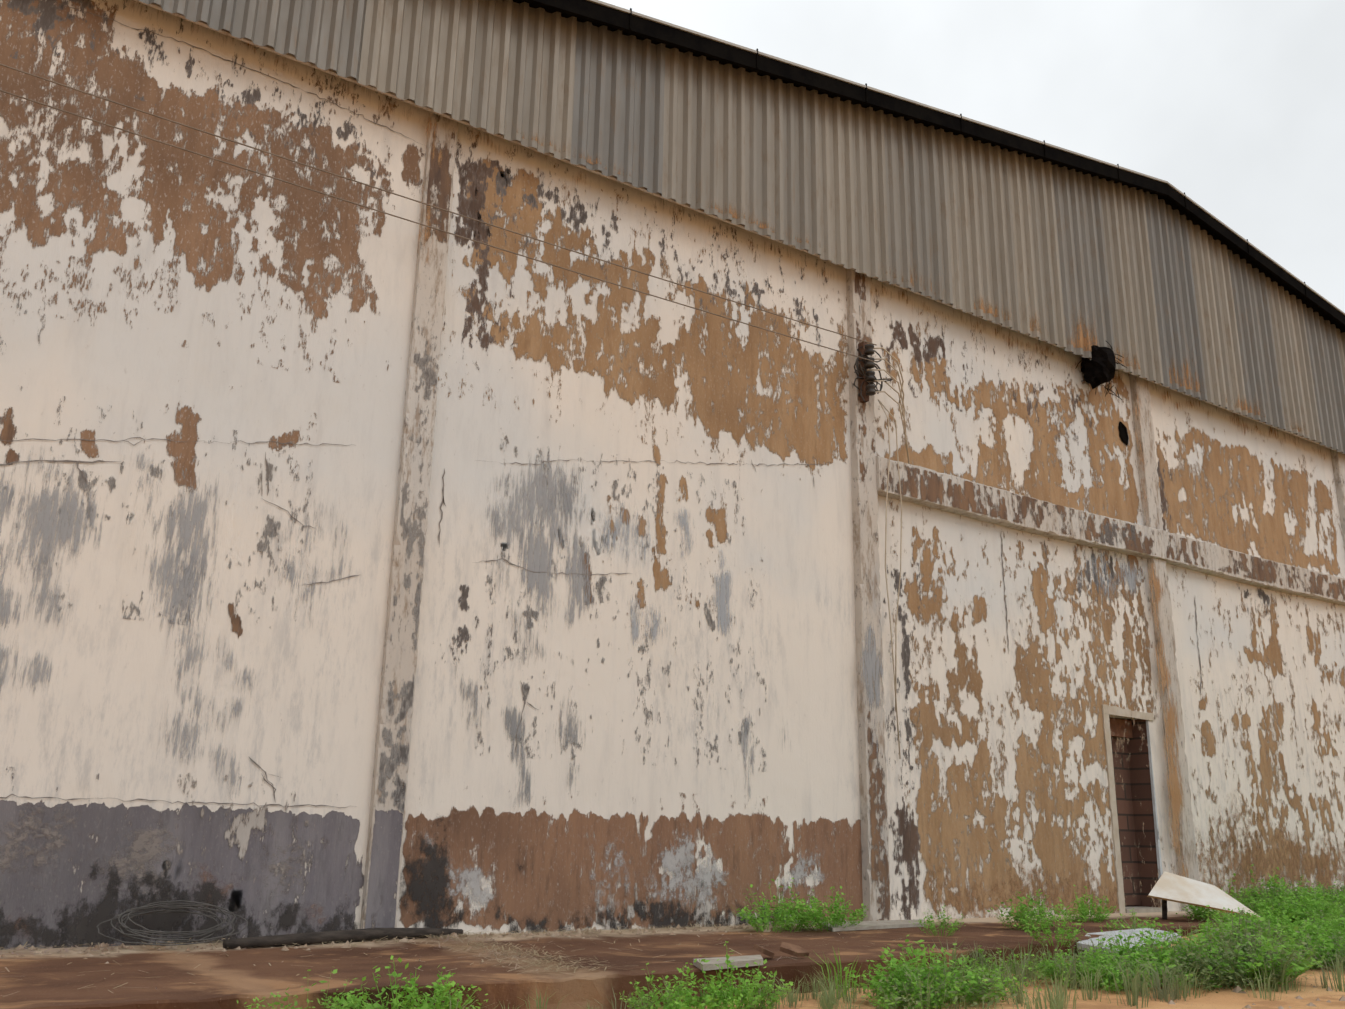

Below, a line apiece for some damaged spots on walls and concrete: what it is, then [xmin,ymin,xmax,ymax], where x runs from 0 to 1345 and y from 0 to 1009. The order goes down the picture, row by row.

peeling [0,0,455,383]
peeling [0,407,19,465]
peeling [80,429,99,458]
peeling [159,396,202,493]
peeling [269,414,316,451]
leakage [0,397,347,758]
peeling [228,603,243,638]
peeling [452,152,1345,917]
spalling [163,773,315,886]
peeling [400,711,890,932]
leakage [0,855,358,950]